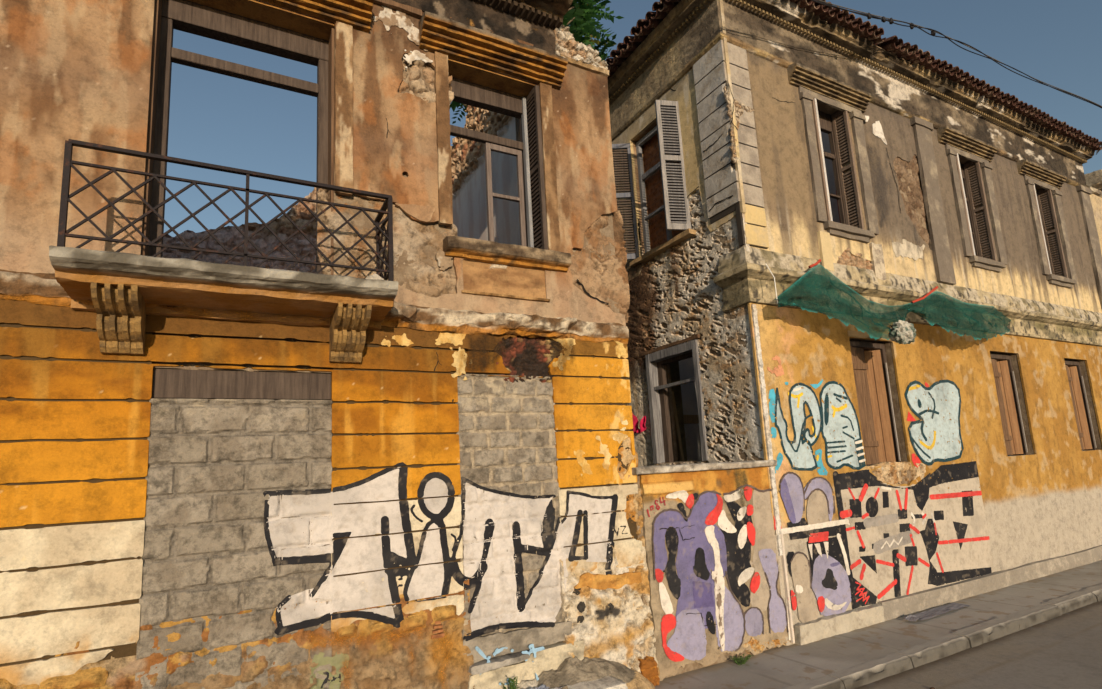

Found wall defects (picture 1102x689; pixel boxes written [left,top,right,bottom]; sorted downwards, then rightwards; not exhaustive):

spalling [373,5,436,103]
peeling [381,333,414,347]
peeling [435,331,472,380]
spalling [559,190,789,686]
spalling [0,579,475,689]